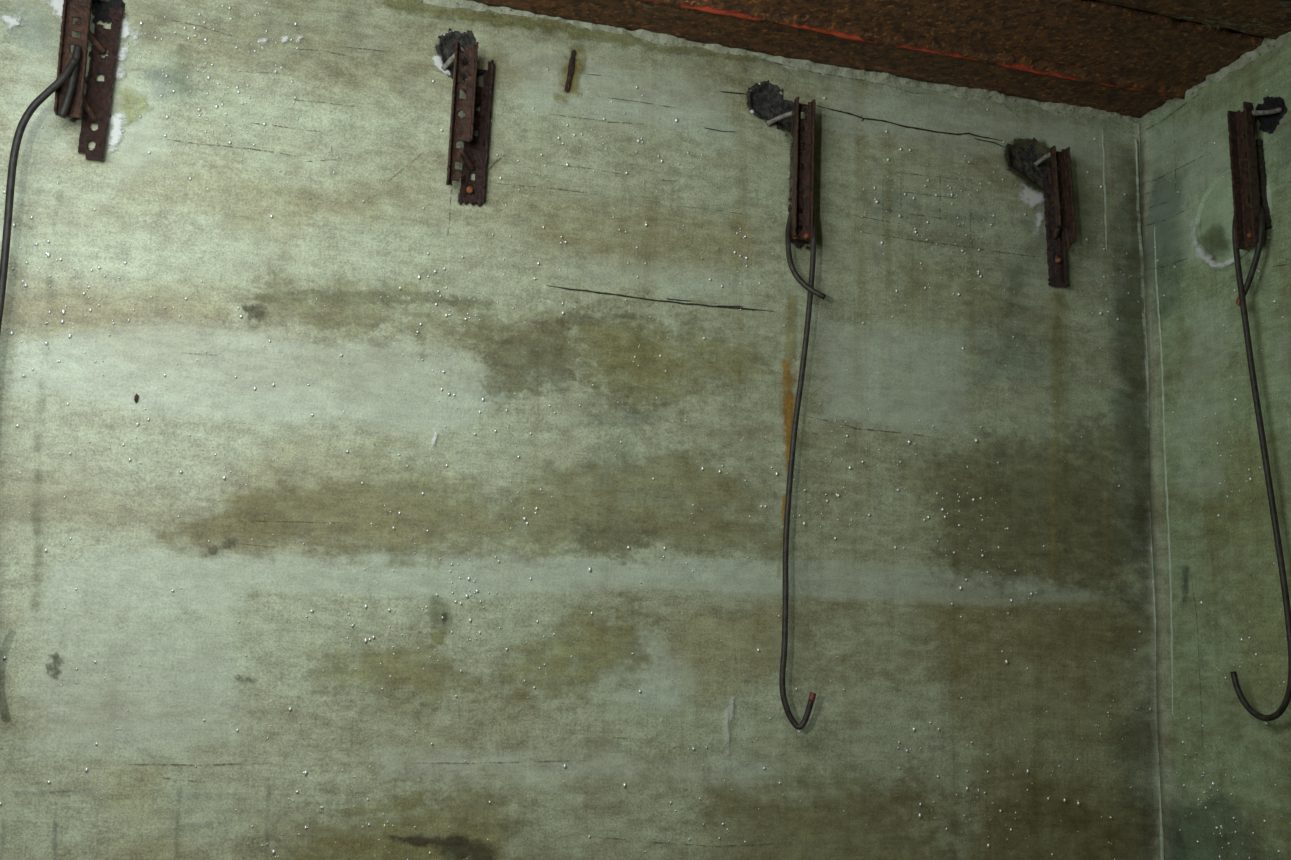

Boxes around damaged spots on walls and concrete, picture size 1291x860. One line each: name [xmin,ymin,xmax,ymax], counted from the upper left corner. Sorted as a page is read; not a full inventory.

damp [248,278,762,398]
crack [546,285,770,311]
corrosion [782,360,796,471]
damp [161,452,780,557]
damp [287,791,506,860]